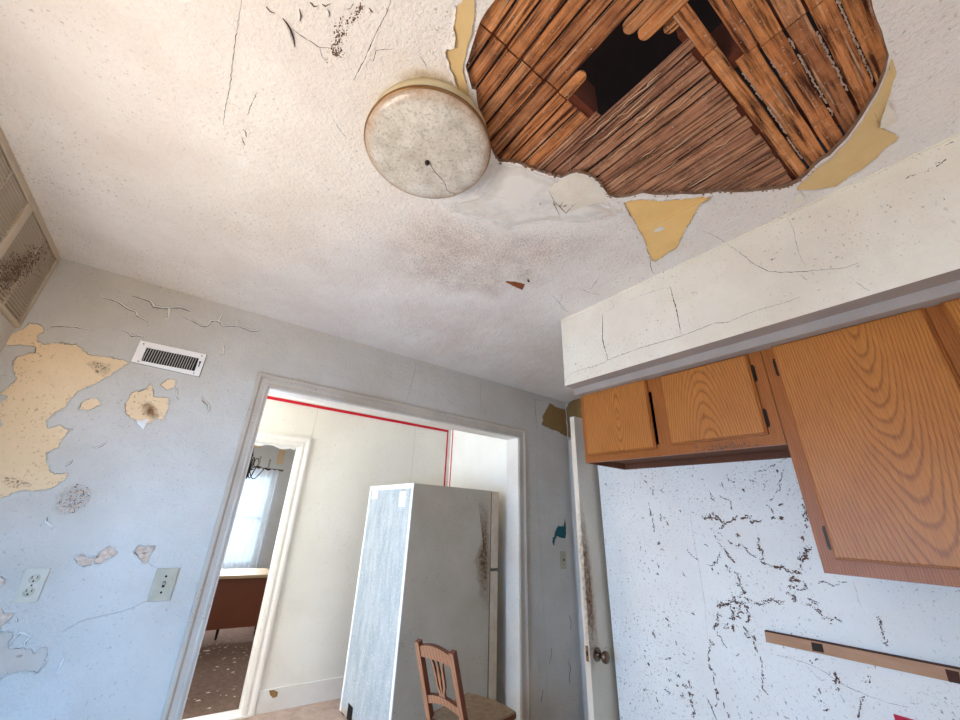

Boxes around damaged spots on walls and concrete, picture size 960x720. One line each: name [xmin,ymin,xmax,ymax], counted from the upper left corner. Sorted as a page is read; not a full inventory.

crack [353,1,391,80]
peeling [441,0,475,98]
peeling [793,59,898,204]
peeling [622,194,713,262]
crack [573,262,788,373]
peeling [0,322,130,530]
peeling [123,378,179,429]
peeling [541,398,582,440]
peeling [71,544,120,568]
peeling [132,544,157,565]
peeling [551,518,567,546]
peeling [0,605,51,682]